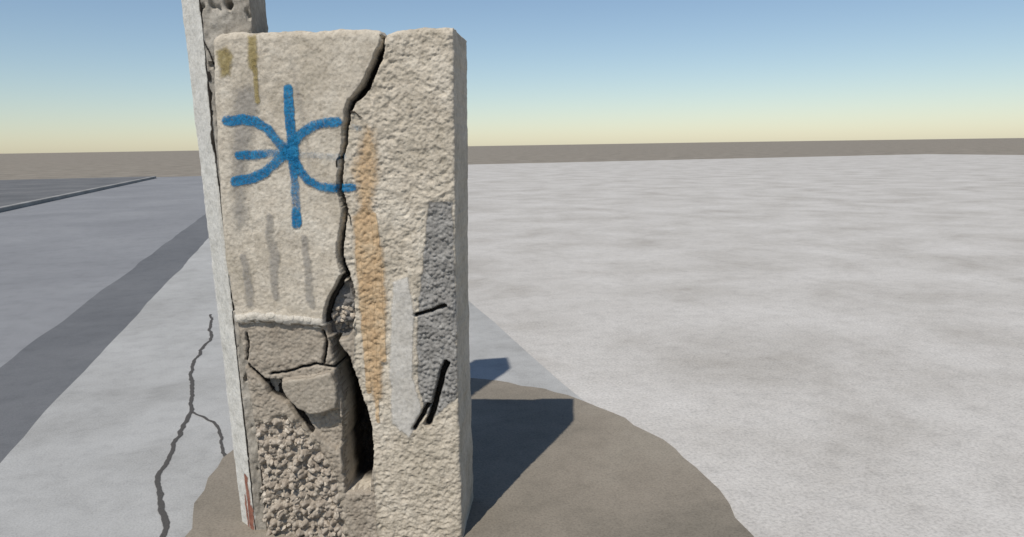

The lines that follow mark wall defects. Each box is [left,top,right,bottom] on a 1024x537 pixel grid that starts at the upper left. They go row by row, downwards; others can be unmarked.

crack [199,0,223,222]
leakage [233,59,260,224]
crack [154,44,385,537]
leakage [265,214,279,299]
rust [353,131,386,423]
crack [415,304,447,316]
spalling [234,278,378,537]
crack [413,360,450,429]
rust [244,474,254,530]